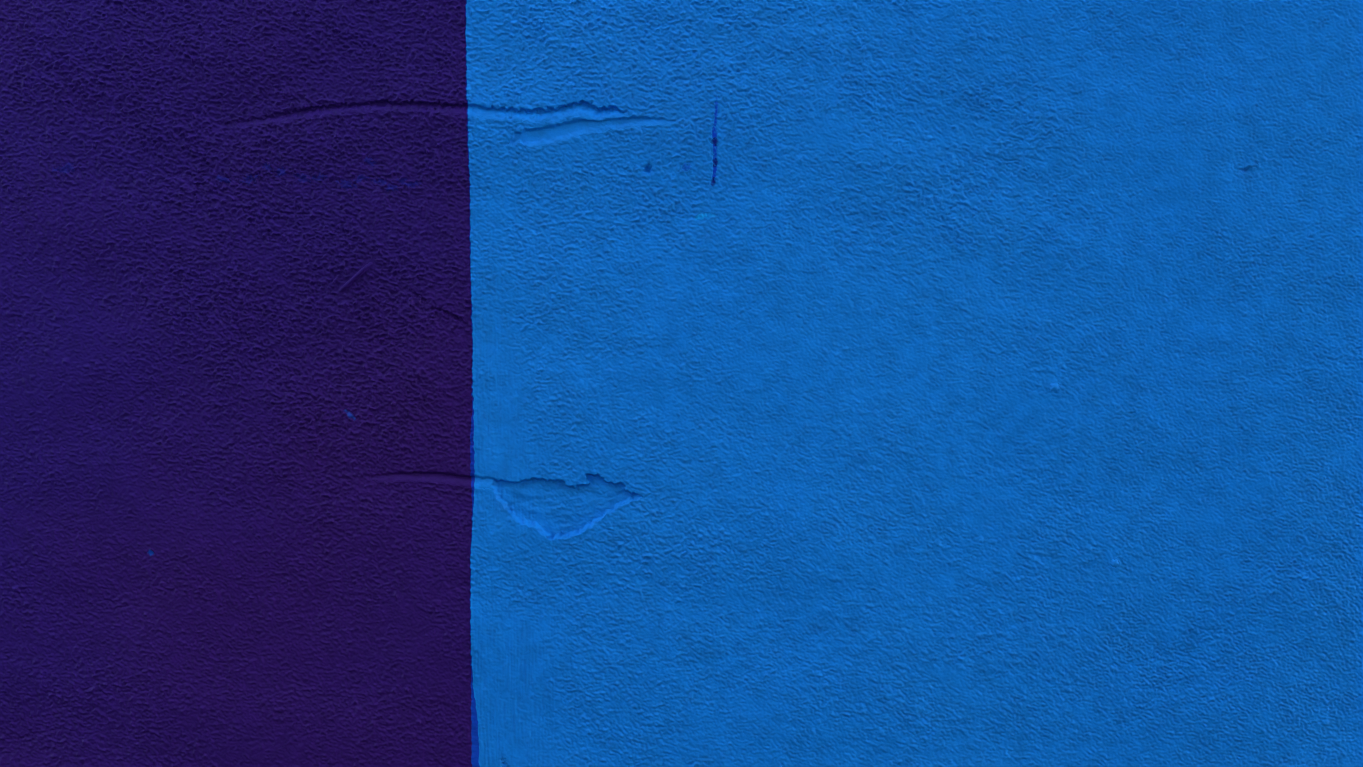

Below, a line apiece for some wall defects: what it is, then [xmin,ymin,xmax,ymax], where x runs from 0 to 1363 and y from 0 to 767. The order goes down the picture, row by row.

crack [227,100,667,149]
crack [371,472,494,489]
spalling [491,474,643,540]